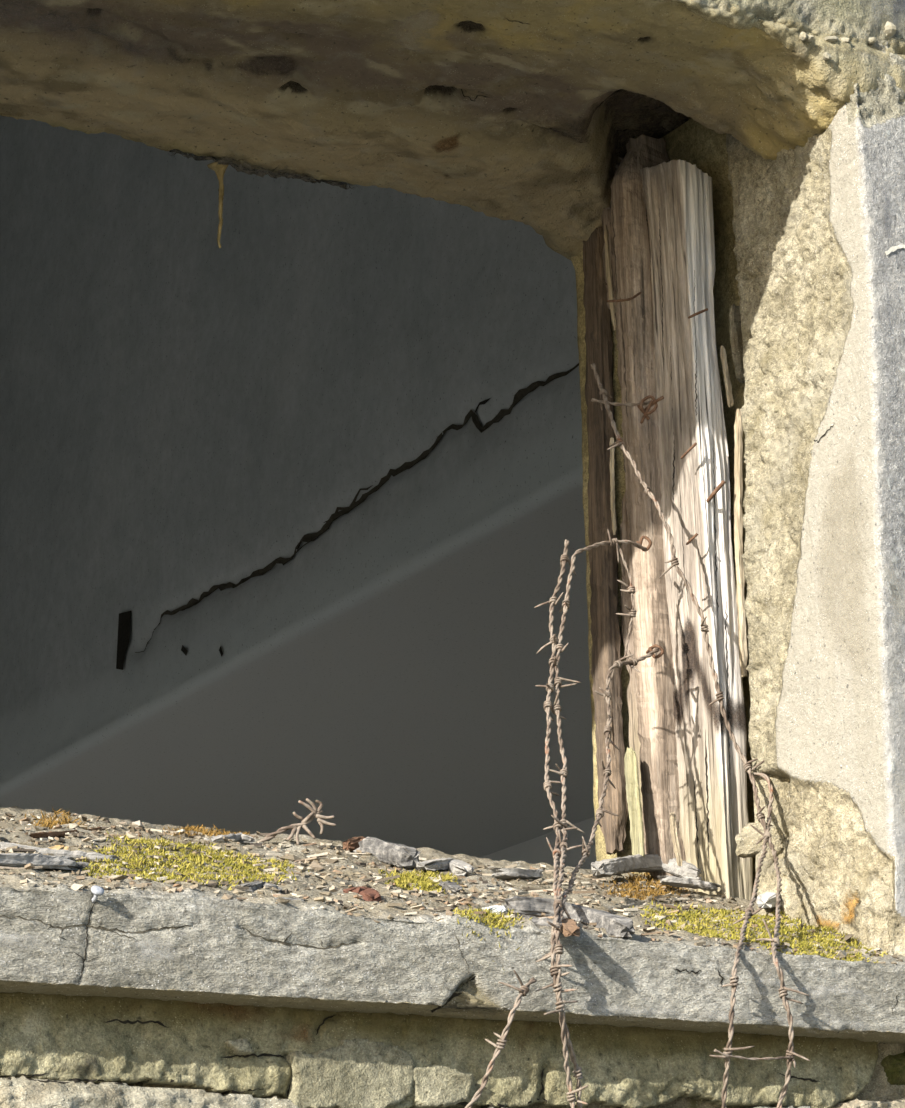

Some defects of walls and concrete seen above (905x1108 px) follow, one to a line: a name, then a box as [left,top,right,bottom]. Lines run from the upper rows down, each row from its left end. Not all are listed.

crack [135,363,579,653]
spalling [726,128,905,957]
crack [0,903,200,983]
crack [431,930,476,1013]